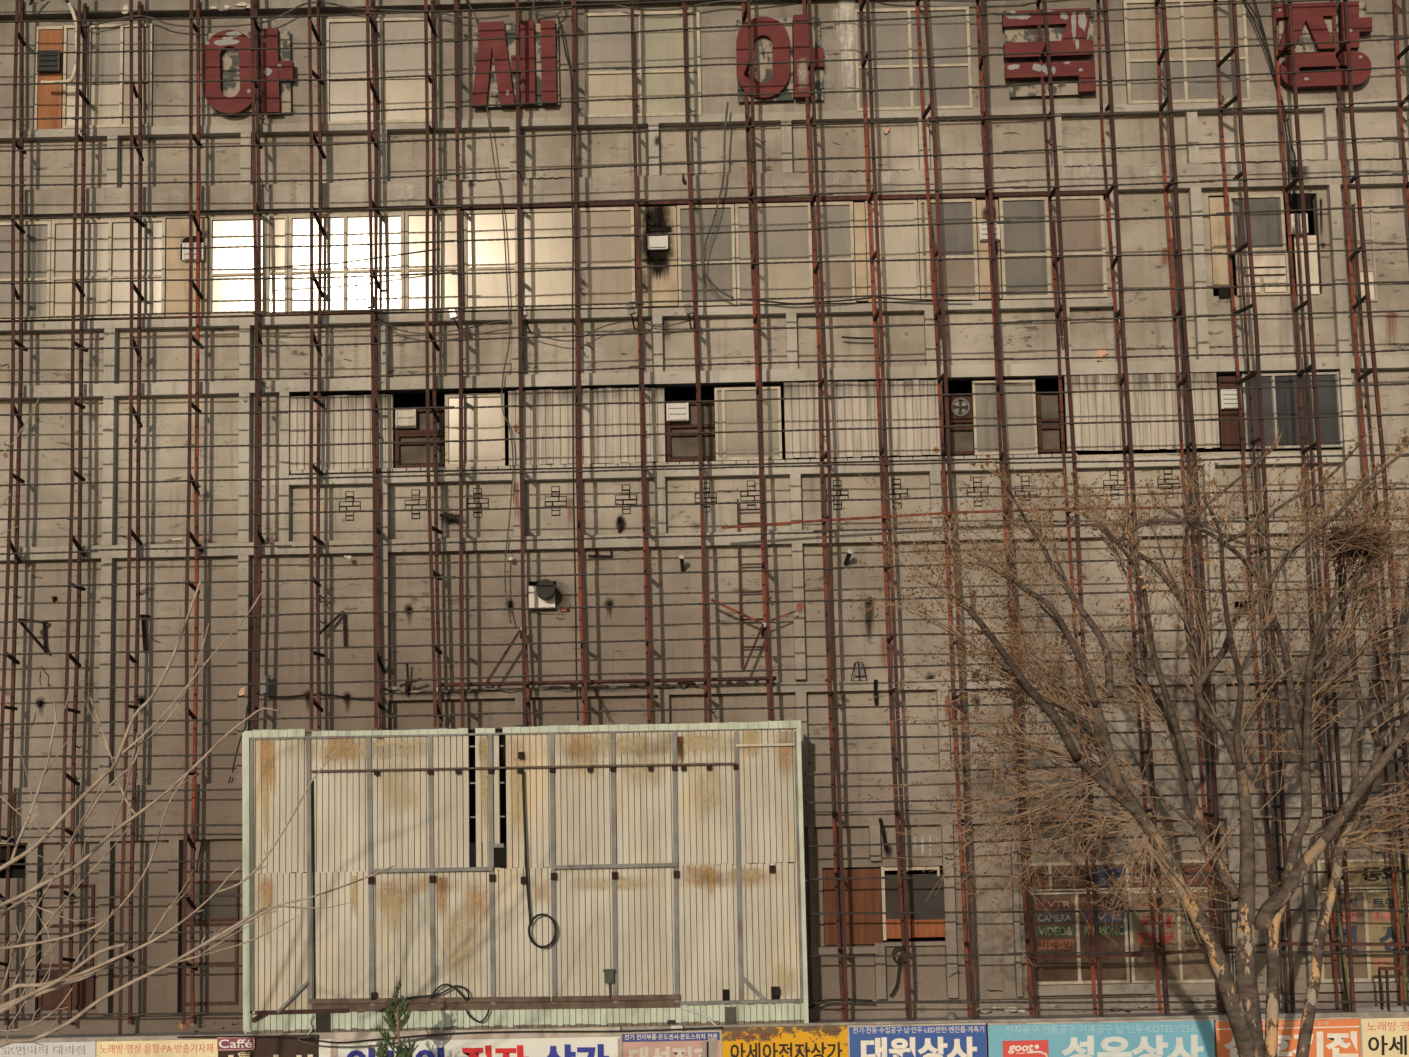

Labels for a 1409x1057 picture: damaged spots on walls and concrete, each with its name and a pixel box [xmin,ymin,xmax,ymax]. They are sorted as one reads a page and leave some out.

water stain [651,256,668,277]
rust [262,741,275,829]